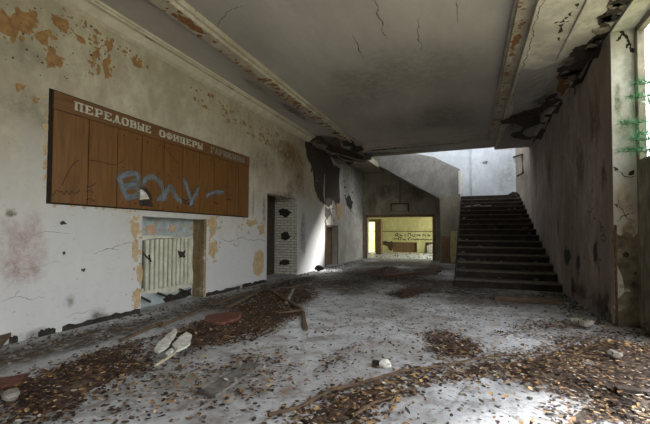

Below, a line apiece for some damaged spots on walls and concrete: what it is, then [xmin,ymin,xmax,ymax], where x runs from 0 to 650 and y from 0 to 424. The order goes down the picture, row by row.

peeling [0,4,149,79]
peeling [496,0,631,149]
crack [616,33,631,48]
peeling [32,94,49,188]
flaking render [191,87,354,224]
peeling [126,210,223,309]
flaking render [612,228,640,328]